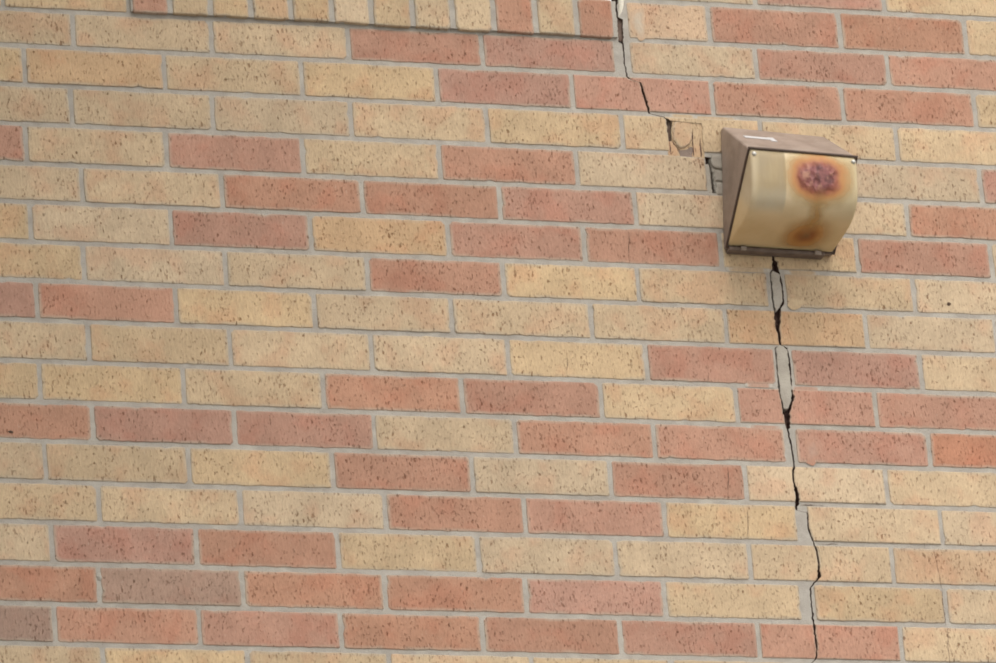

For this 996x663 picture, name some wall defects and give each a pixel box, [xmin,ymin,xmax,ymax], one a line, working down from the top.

crack [611,0,723,195]
crack [770,257,836,663]